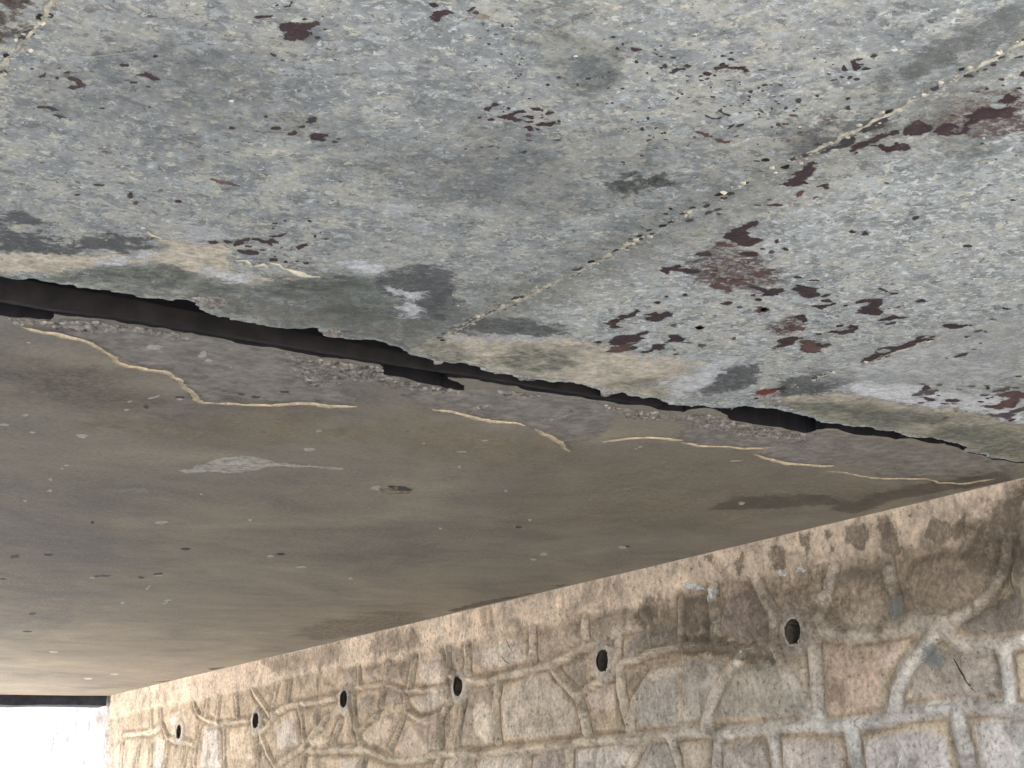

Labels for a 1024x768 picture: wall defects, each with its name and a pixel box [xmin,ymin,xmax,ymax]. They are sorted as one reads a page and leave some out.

corrosion [904,86,1024,138]
corrosion [692,245,780,290]
spalling [322,329,344,338]
crack [21,327,357,408]
spalling [285,353,460,395]
crack [434,410,570,452]
crack [603,437,993,485]
leakage [845,516,901,553]
leakage [926,485,1024,572]